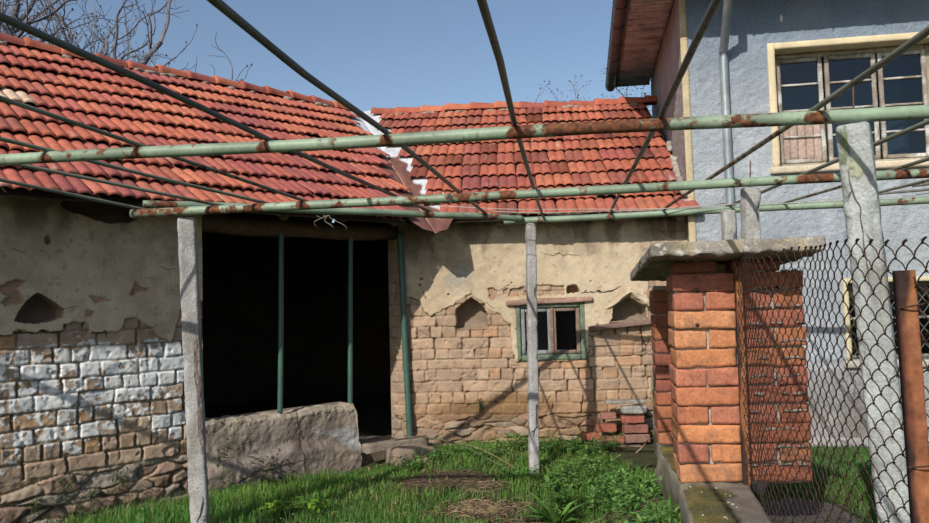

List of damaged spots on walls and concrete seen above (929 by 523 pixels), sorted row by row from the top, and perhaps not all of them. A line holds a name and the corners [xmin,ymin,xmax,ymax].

crack [846,170,873,292]
flaking render [0,279,26,307]
flaking render [487,282,580,302]
crack [196,410,311,522]